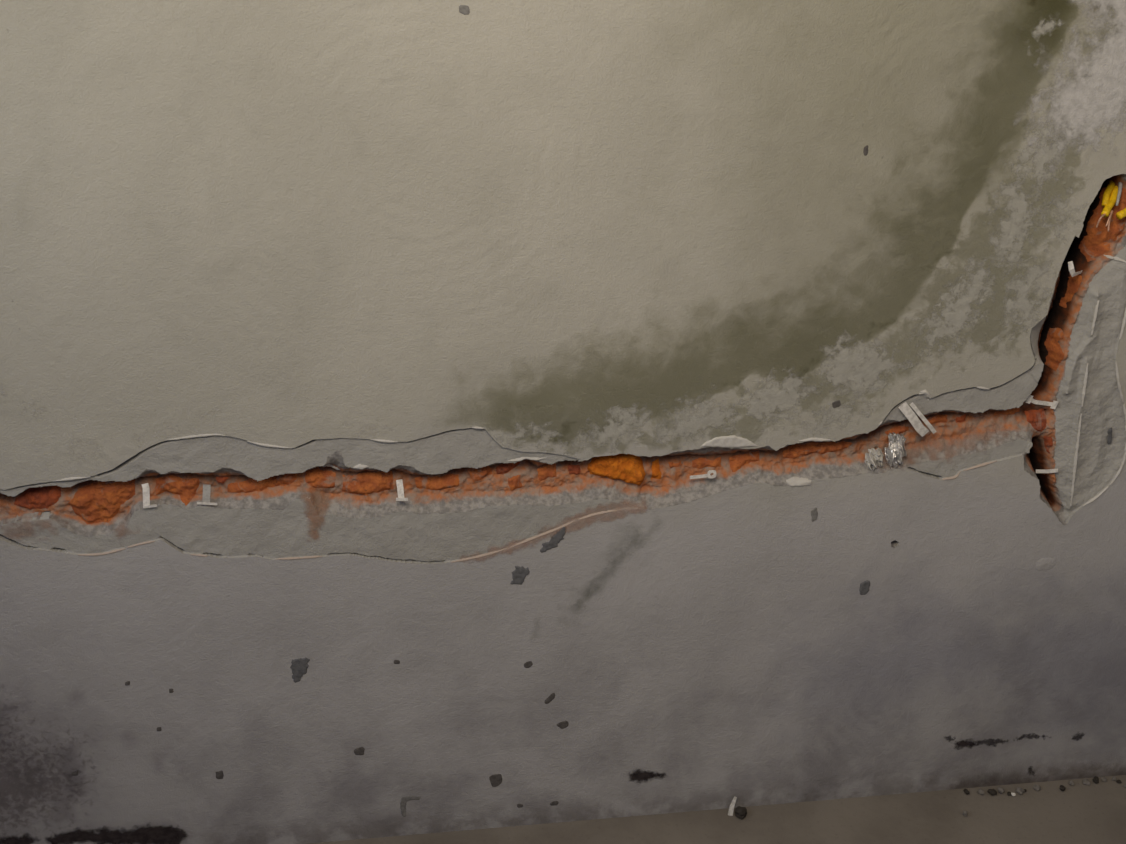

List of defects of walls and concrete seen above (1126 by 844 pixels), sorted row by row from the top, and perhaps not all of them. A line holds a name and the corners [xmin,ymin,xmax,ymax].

leakage [814,0,1126,435]
spalling [879,187,1126,523]
spalling [0,427,759,525]
leakage [501,370,816,449]
peeling [786,477,812,487]
flaking render [783,438,852,458]
spalling [540,526,567,553]